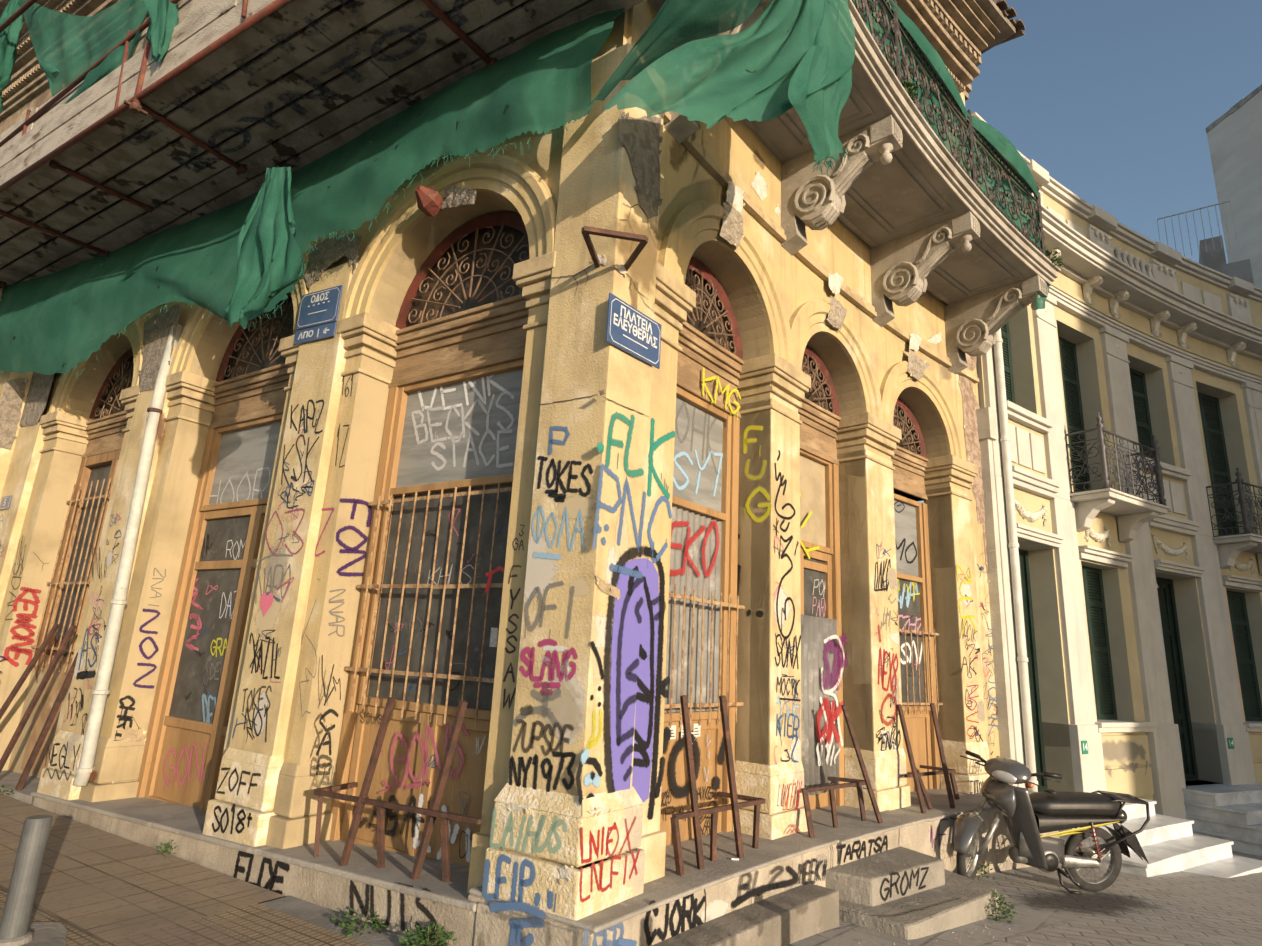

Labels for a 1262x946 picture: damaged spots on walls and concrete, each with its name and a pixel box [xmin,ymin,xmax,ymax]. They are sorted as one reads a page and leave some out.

flaking render [618,112,663,219]
flaking render [719,171,780,248]